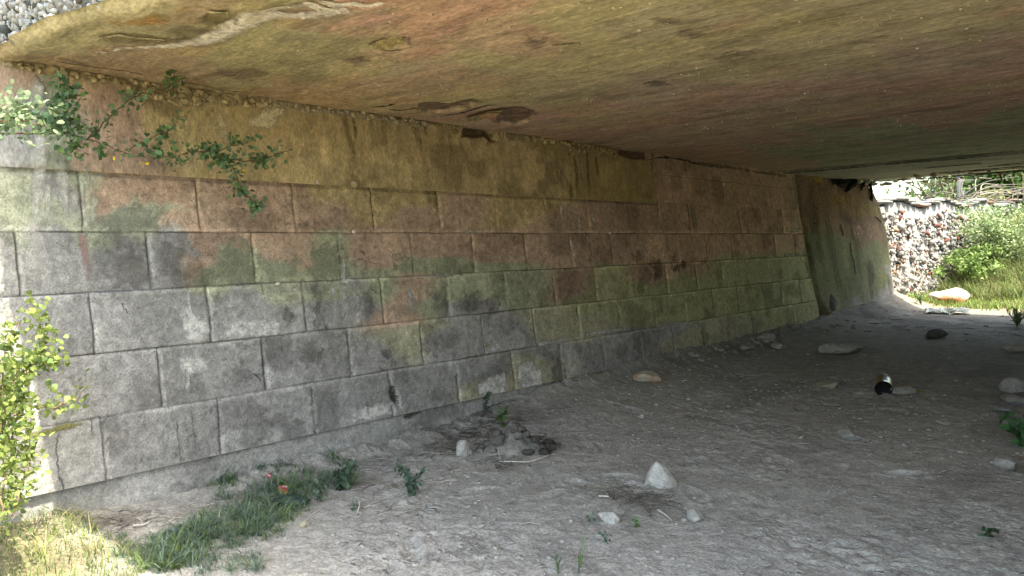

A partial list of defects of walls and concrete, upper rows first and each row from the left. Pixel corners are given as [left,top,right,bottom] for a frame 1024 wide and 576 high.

damp [100,1,384,54]
spalling [0,59,562,146]
crack [55,432,65,489]